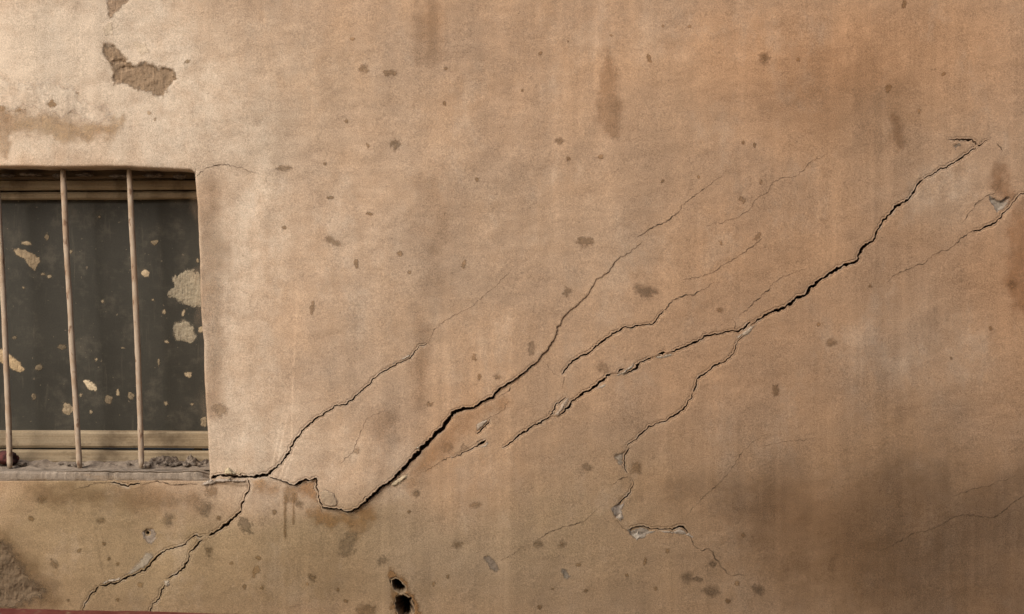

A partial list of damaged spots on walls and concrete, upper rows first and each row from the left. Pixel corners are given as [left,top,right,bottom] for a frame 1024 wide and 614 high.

spalling [102,0,176,96]
peeling [0,77,112,123]
damp [0,106,124,154]
crack [73,136,1024,612]